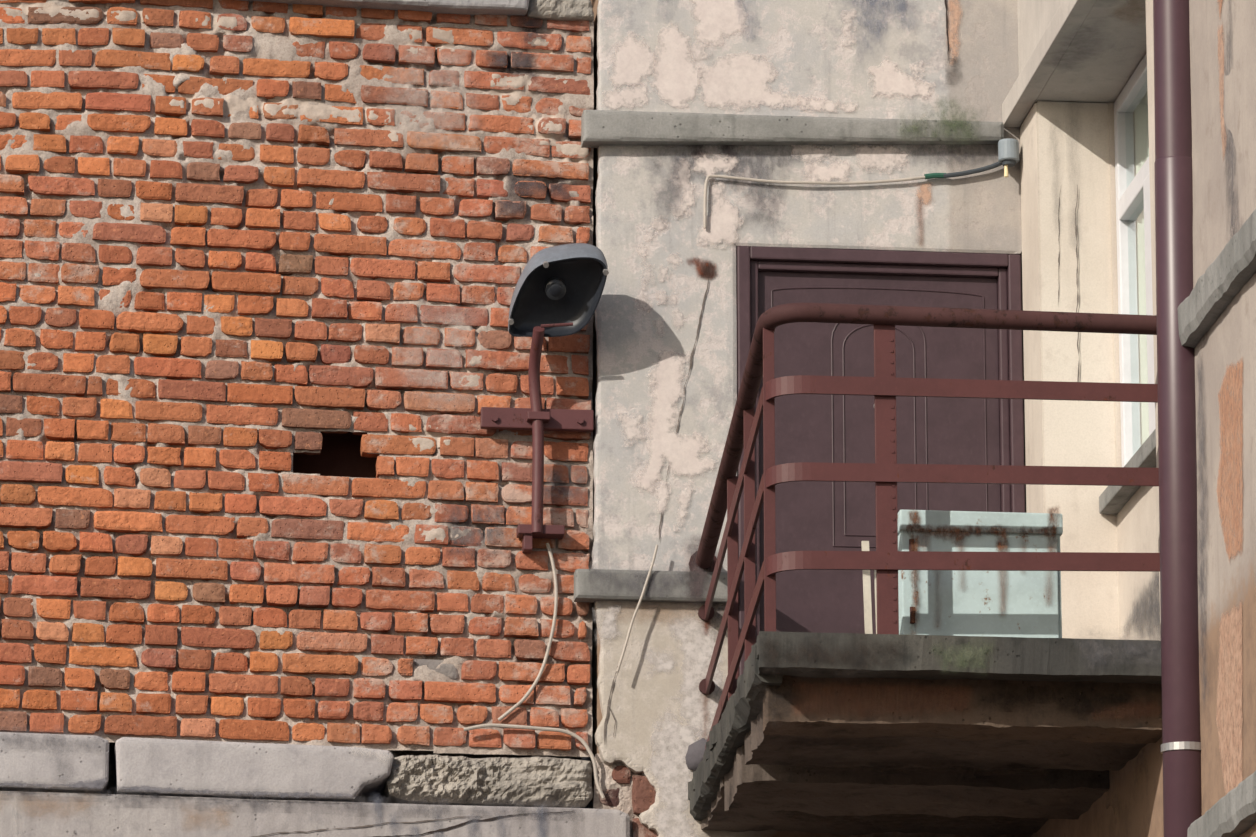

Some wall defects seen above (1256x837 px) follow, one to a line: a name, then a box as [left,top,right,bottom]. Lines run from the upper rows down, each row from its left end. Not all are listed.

peeling [604,0,855,112]
peeling [869,61,931,97]
flaking render [944,0,961,62]
crack [676,278,709,434]
hole [293,432,377,478]
peeling [618,351,715,532]
flaking render [1217,359,1243,558]
peeling [599,607,618,640]
peeling [593,614,722,837]
flaking render [1216,605,1243,793]
crack [252,811,574,837]